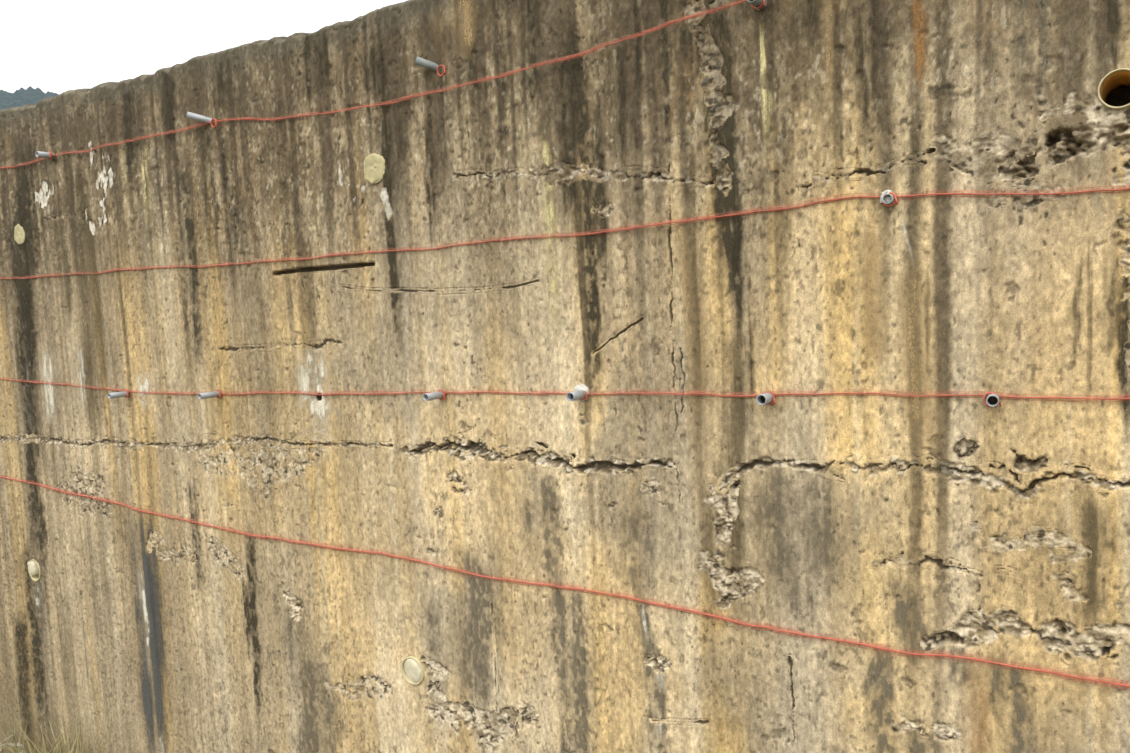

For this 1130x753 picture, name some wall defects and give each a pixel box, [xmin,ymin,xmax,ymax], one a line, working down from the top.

spalling [683,0,736,197]
spalling [917,89,1130,305]
crack [0,161,717,512]
water stain [11,152,54,735]
crack [714,452,1130,504]
spalling [1008,448,1072,474]
spalling [146,529,246,584]
spalling [695,472,766,611]
spalling [968,522,1092,605]
spalling [918,600,1130,669]
spalling [323,671,394,702]
spalling [417,652,542,753]